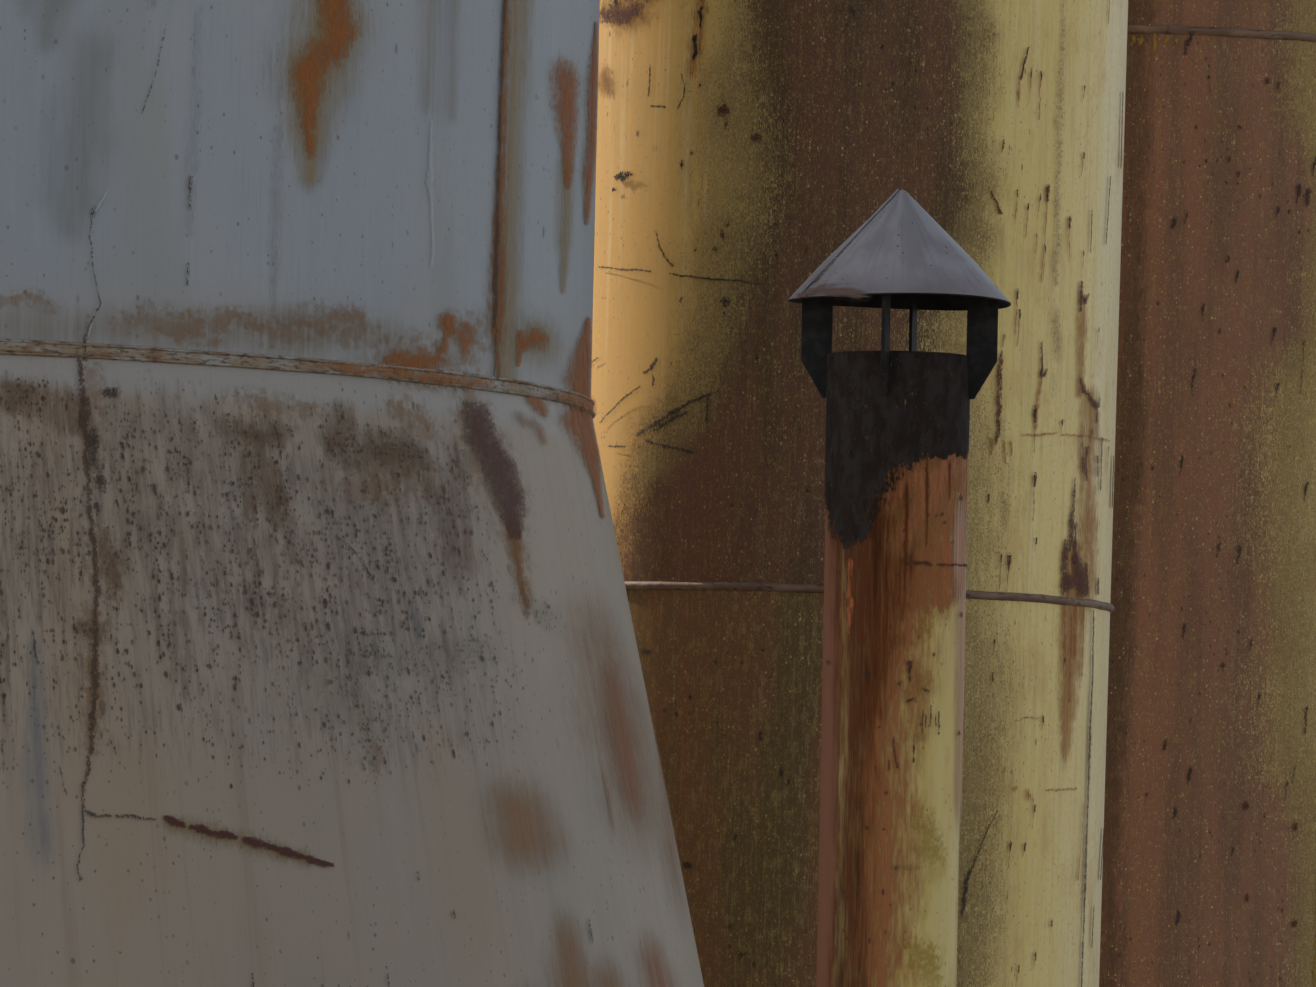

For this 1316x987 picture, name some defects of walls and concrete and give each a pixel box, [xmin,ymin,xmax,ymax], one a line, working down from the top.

crack [76,208,156,882]
rust [289,0,363,185]
rust [309,0,551,611]
rust [521,316,605,518]
rust [550,22,612,290]
rust [612,171,633,192]
rust [816,409,968,987]
rust [1015,0,1109,761]